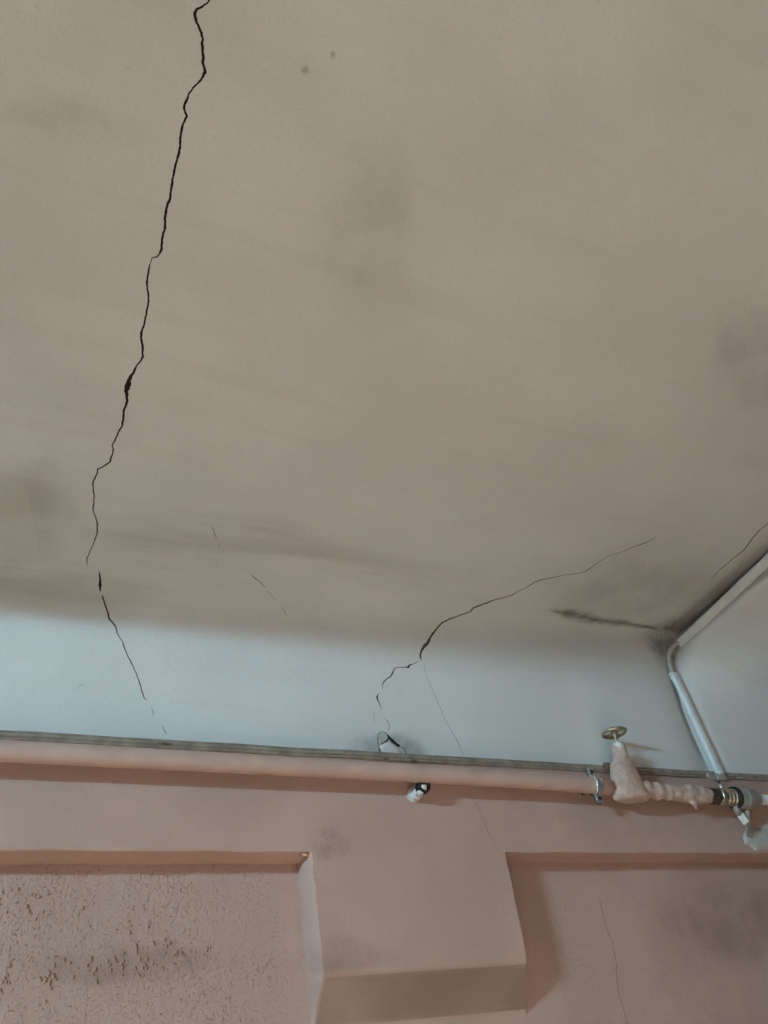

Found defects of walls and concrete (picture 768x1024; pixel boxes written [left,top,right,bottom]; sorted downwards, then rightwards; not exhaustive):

crack [86,0,210,734]
crack [373,539,653,767]
crack [713,523,768,577]